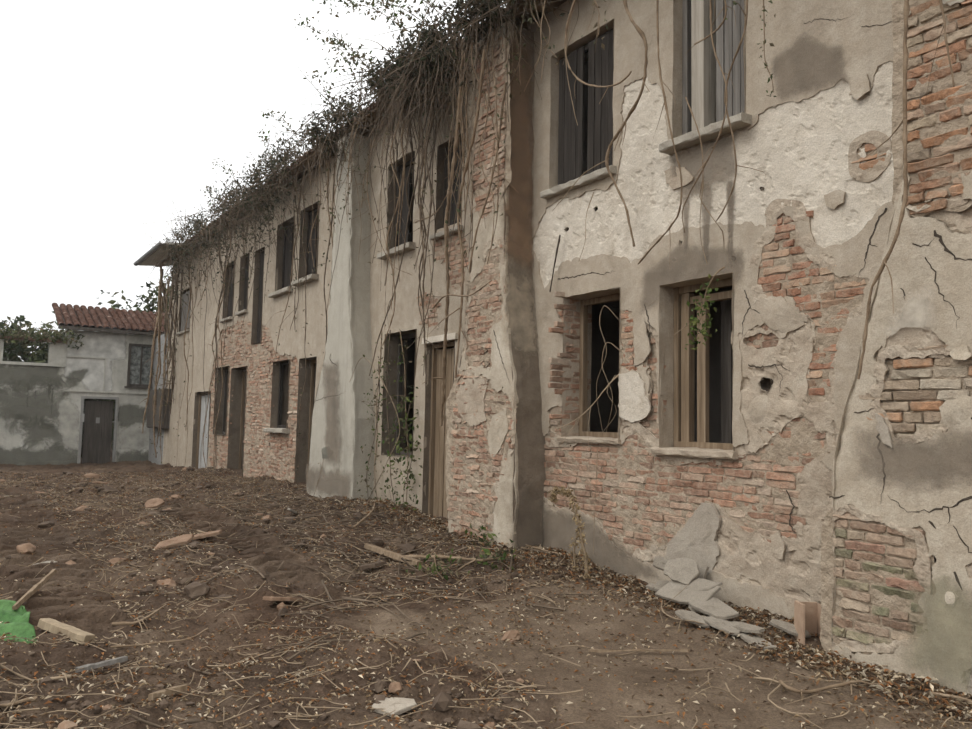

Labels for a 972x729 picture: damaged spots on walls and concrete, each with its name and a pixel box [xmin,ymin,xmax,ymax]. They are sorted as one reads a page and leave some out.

flaking render [466,37,512,226]
flaking render [208,315,302,483]
flaking render [416,222,518,542]
flaking render [533,0,972,655]
crack [912,230,972,327]
crack [881,472,972,553]